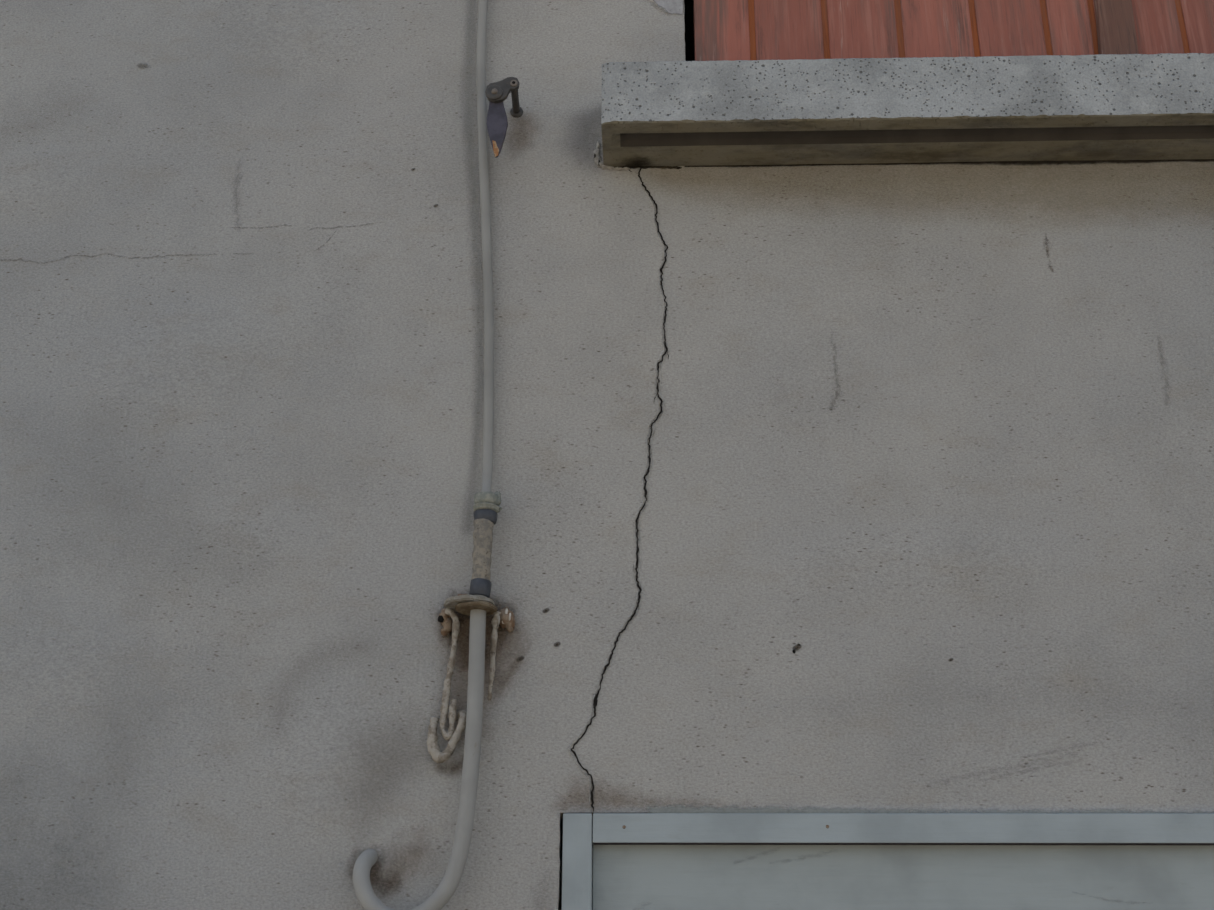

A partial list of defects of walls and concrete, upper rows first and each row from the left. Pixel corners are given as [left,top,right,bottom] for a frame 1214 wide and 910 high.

peeling [650,0,683,14]
crack [567,157,682,813]